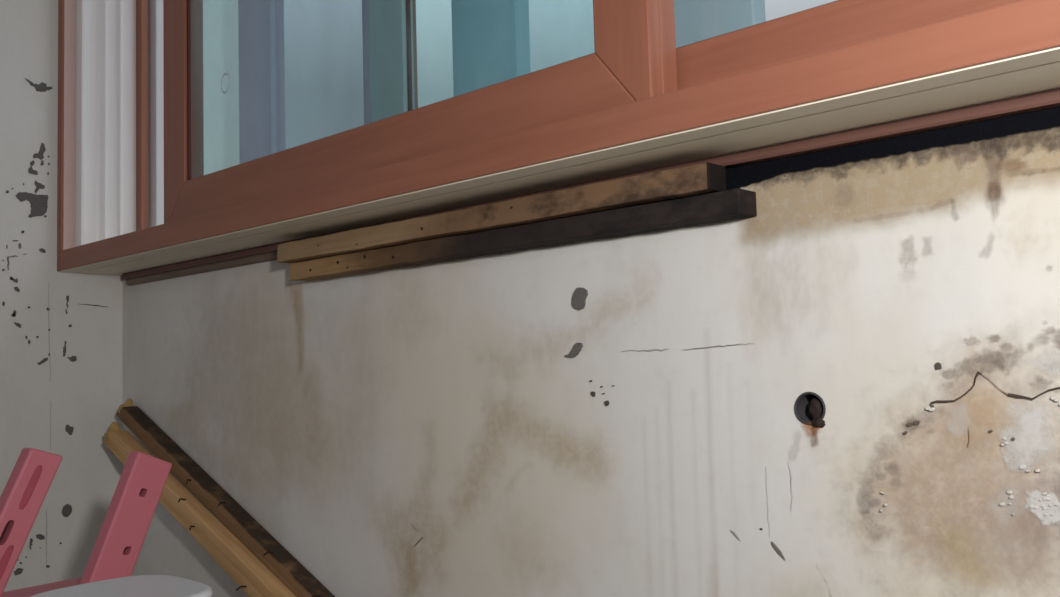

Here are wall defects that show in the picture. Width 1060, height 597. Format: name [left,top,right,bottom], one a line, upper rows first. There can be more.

peeling [25,78,52,92]
peeling [6,143,50,218]
leakage [725,106,1060,234]
peeling [2,231,27,292]
crack [930,371,1060,406]
peeling [989,407,1049,472]
peeling [999,490,1060,525]